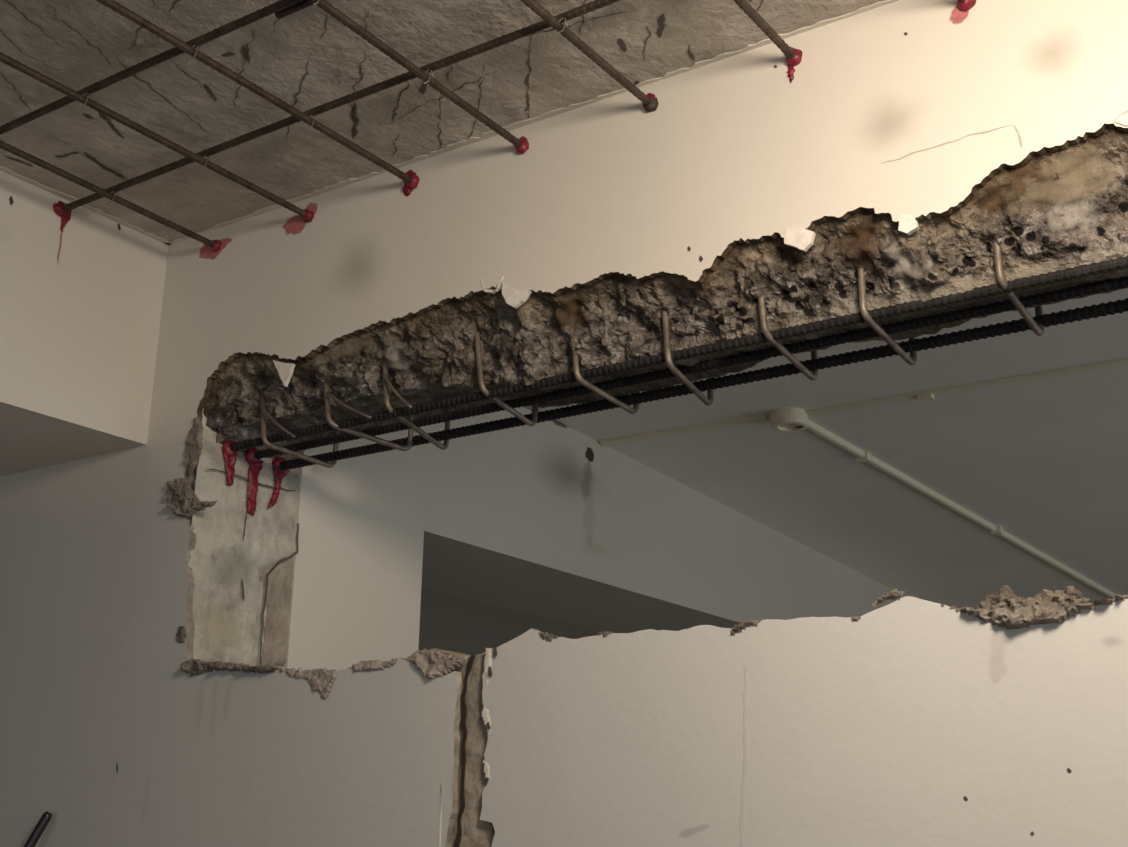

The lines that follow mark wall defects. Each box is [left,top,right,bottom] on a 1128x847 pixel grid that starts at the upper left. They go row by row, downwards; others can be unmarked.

crack [0,0,112,68]
crack [349,51,366,127]
crack [390,81,409,124]
spalling [164,113,1128,518]
spalling [176,626,187,643]
spalling [731,620,759,635]
spalling [872,588,905,607]
spalling [941,585,1128,629]
spalling [352,658,397,672]
spalling [412,646,497,847]
crack [439,654,475,847]